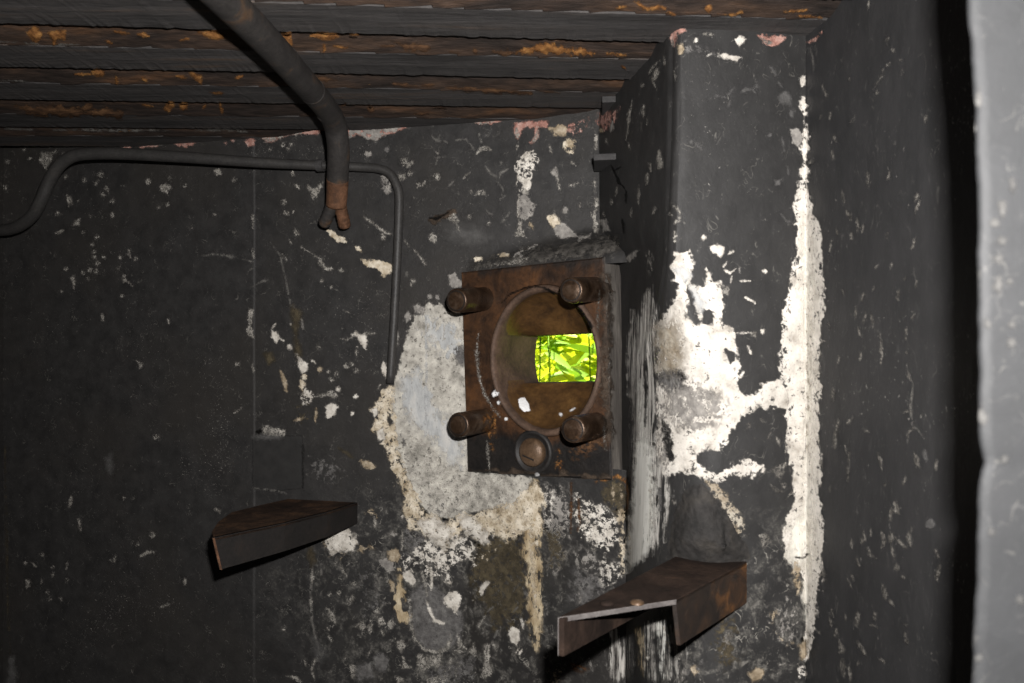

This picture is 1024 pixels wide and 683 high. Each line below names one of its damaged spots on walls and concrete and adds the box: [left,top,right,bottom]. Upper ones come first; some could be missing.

peeling [326,294,547,683]
peeling [654,207,792,534]
peeling [816,609,878,683]
peeling [847,501,912,588]